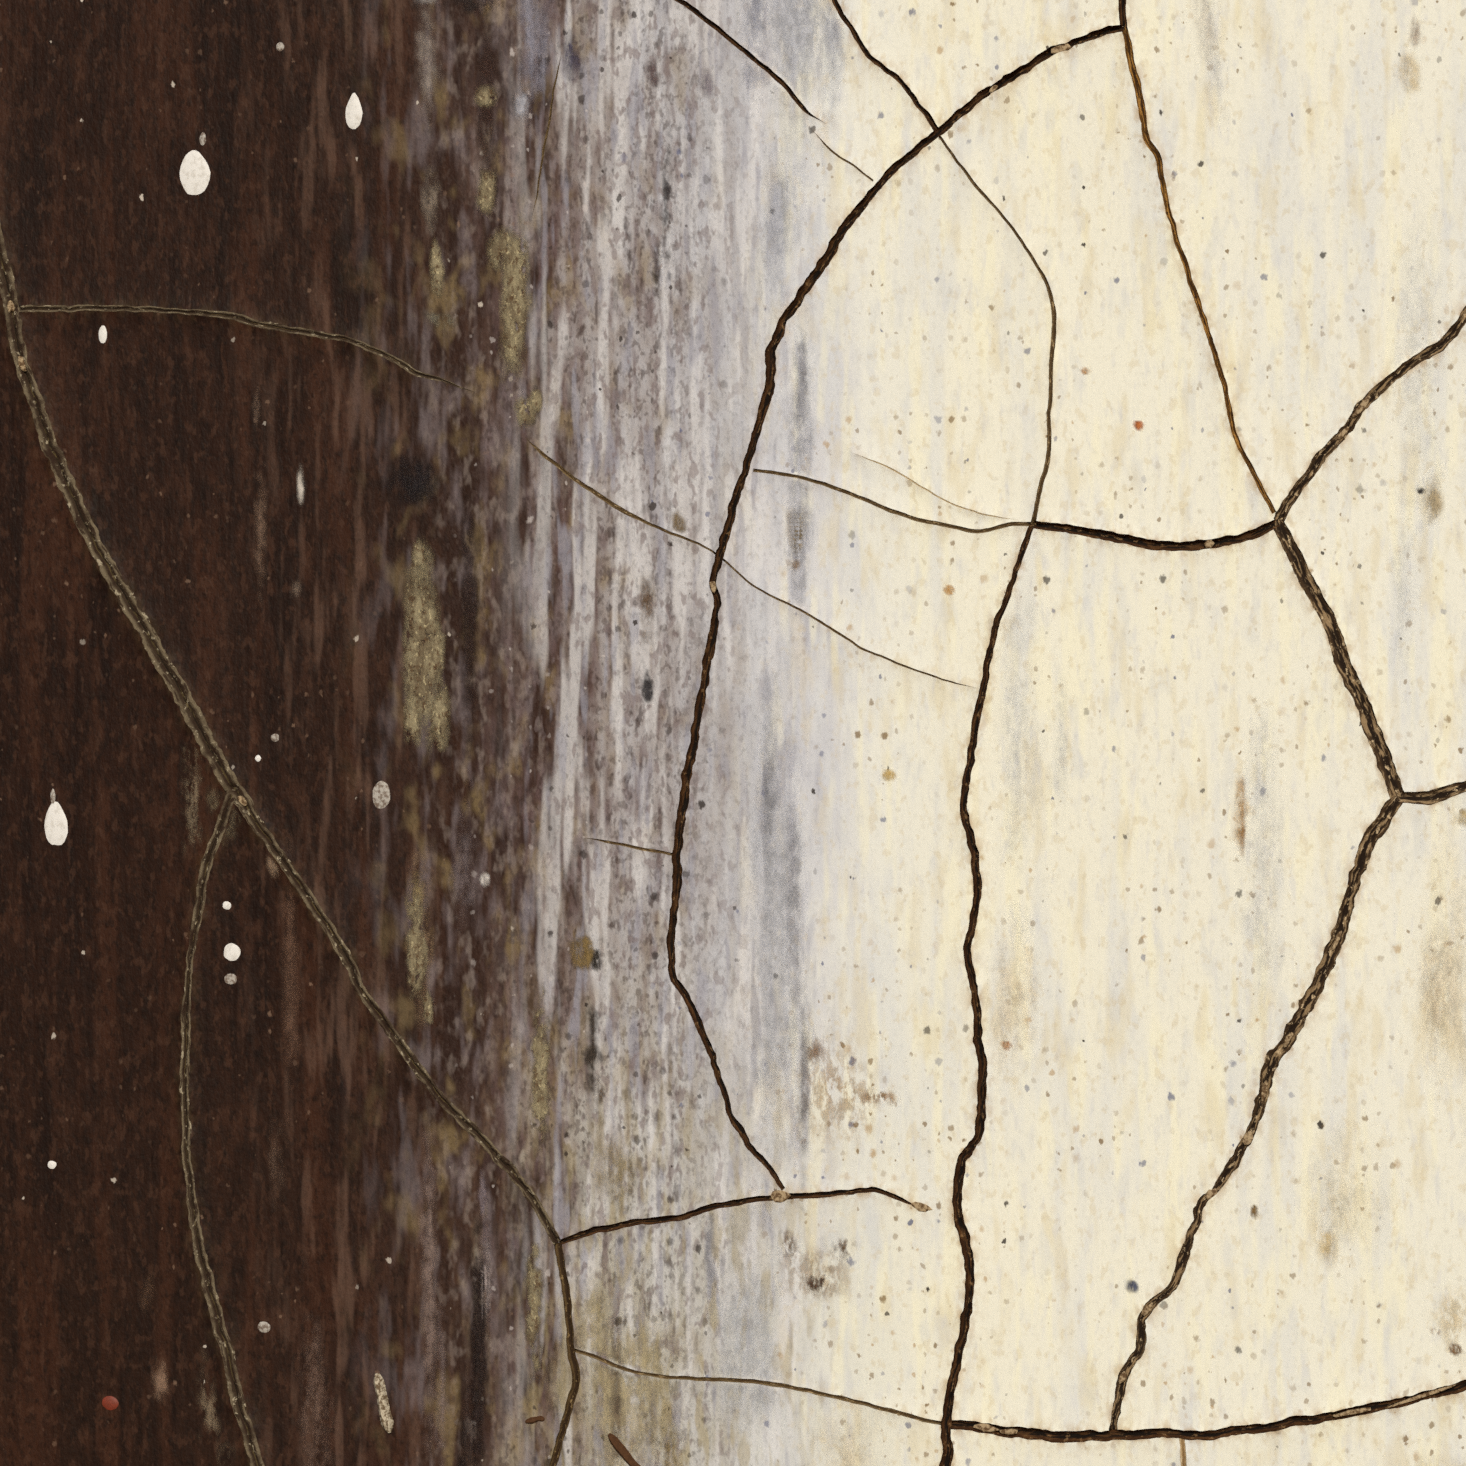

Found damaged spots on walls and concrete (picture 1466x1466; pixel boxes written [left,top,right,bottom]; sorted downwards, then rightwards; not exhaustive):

water stain [420,40,435,90]
water stain [517,94,526,113]
water stain [775,0,838,80]
water stain [790,358,811,600]
water stain [642,673,653,701]
crack [526,0,1466,1466]
crack [0,224,932,1466]
water stain [454,839,489,901]
water stain [764,788,790,970]
water stain [592,951,600,969]
water stain [421,1185,435,1370]